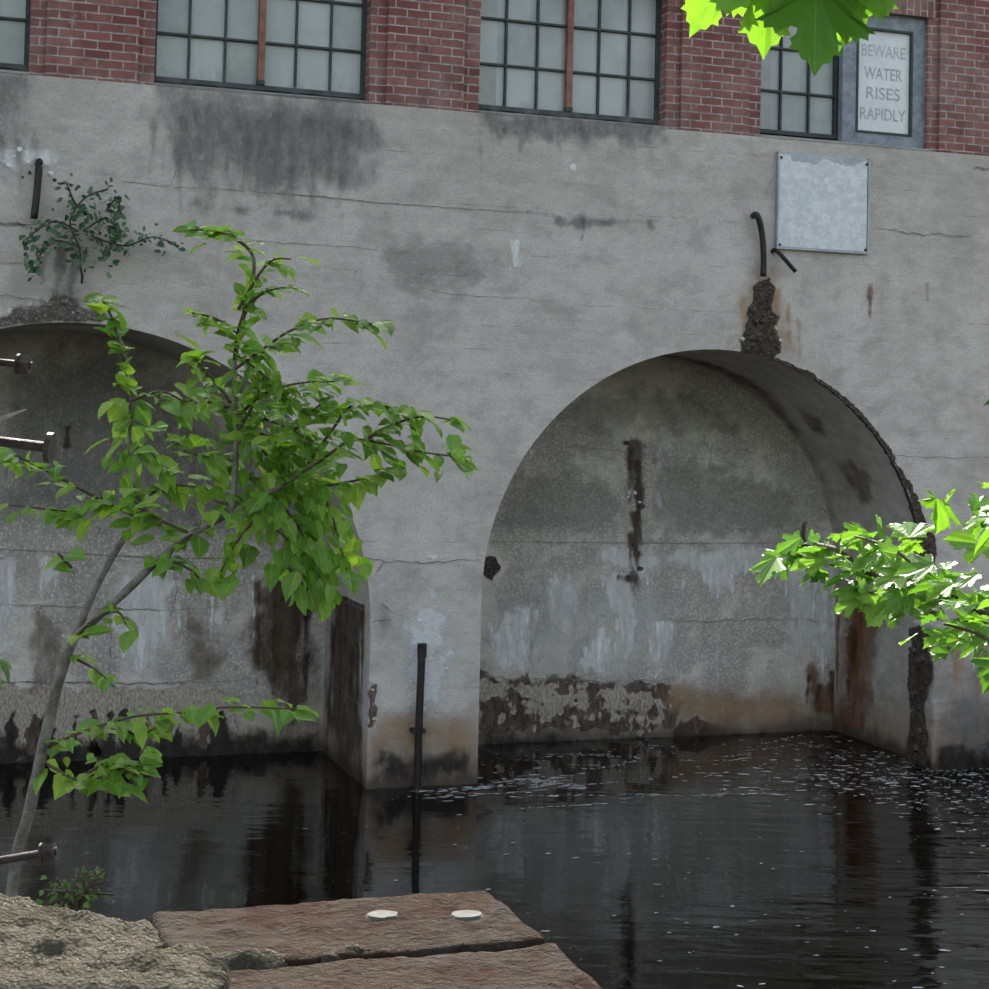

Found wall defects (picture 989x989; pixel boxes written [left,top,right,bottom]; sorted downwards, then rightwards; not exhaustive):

damp [175,95,373,189]
damp [0,731,327,763]
damp [250,575,312,723]
damp [326,595,364,784]
spalling [483,556,501,580]
efflorescence [490,573,578,674]
peeling [478,670,726,737]
corrosion [624,439,646,595]
efflorescence [579,546,766,678]
corrosion [806,604,878,731]